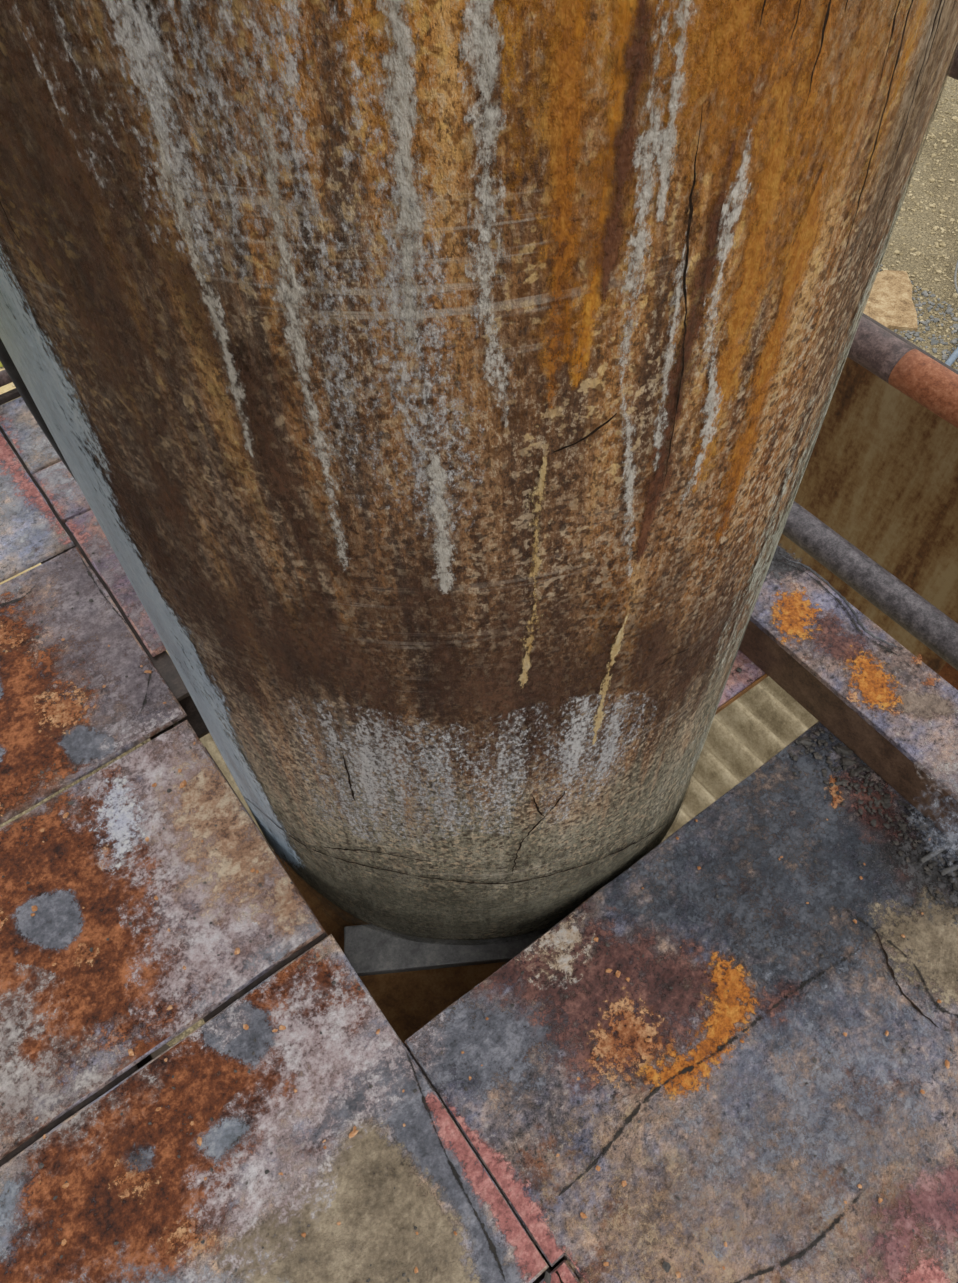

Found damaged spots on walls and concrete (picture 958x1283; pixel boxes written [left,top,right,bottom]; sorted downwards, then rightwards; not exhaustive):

crack [790,0,848,107]
crack [834,0,945,305]
rust [0,0,748,776]
water stain [276,613,656,845]
rust [772,583,957,719]
water stain [0,973,127,1170]
rust [0,591,373,1283]
water stain [189,962,443,1275]
water stain [60,708,680,1048]
rust [470,903,804,1117]
crack [559,908,958,1196]
crack [734,1189,865,1283]